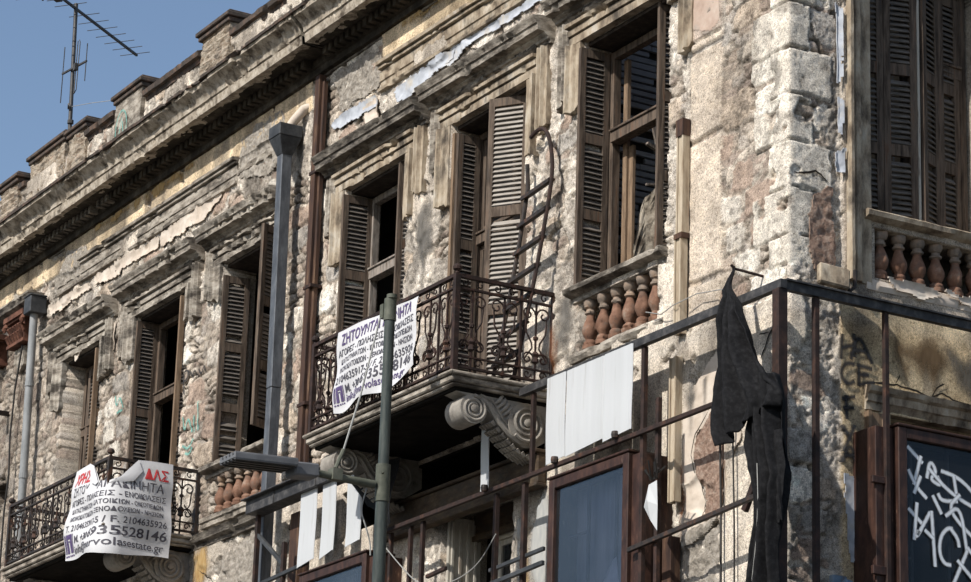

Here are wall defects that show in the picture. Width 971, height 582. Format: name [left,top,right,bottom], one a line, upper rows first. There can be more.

flaking render [331,51,383,130]
peeling [394,0,541,102]
peeling [49,193,222,316]
peeling [888,276,971,308]
damp [895,340,971,395]
peeling [681,352,742,582]